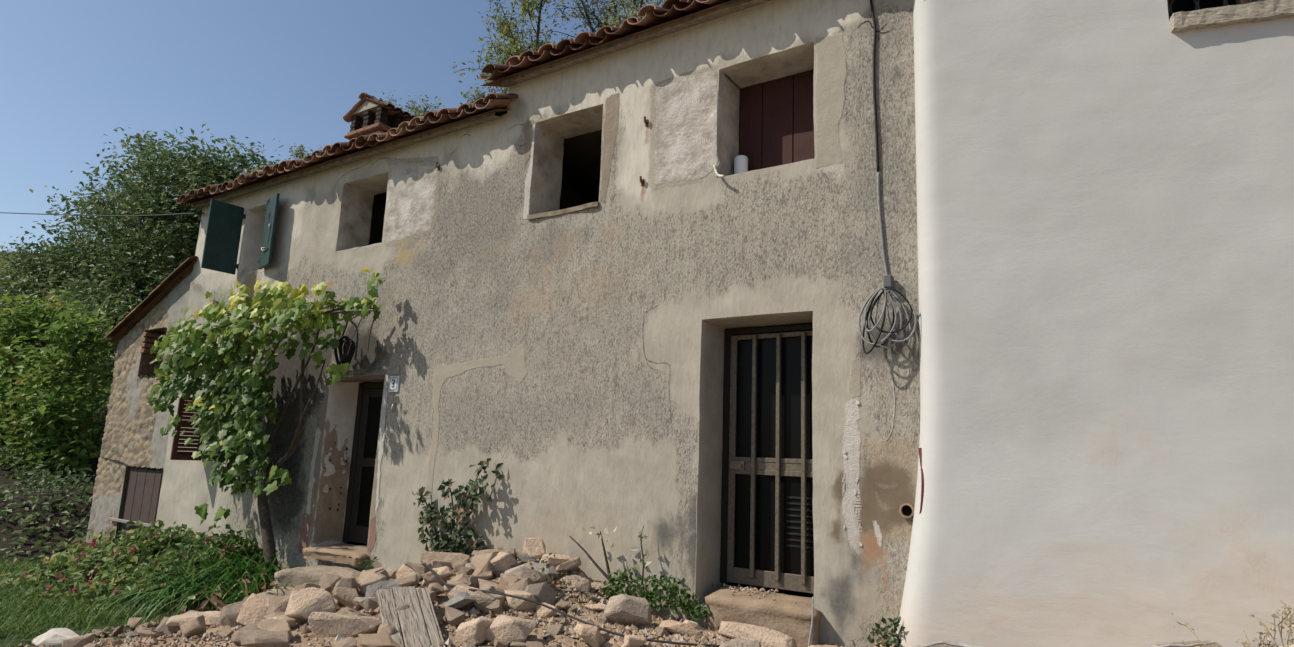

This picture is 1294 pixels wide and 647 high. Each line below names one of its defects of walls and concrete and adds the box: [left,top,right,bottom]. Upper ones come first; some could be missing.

peeling [298,397,350,555]
peeling [842,357,863,554]
leakage [832,462,915,547]